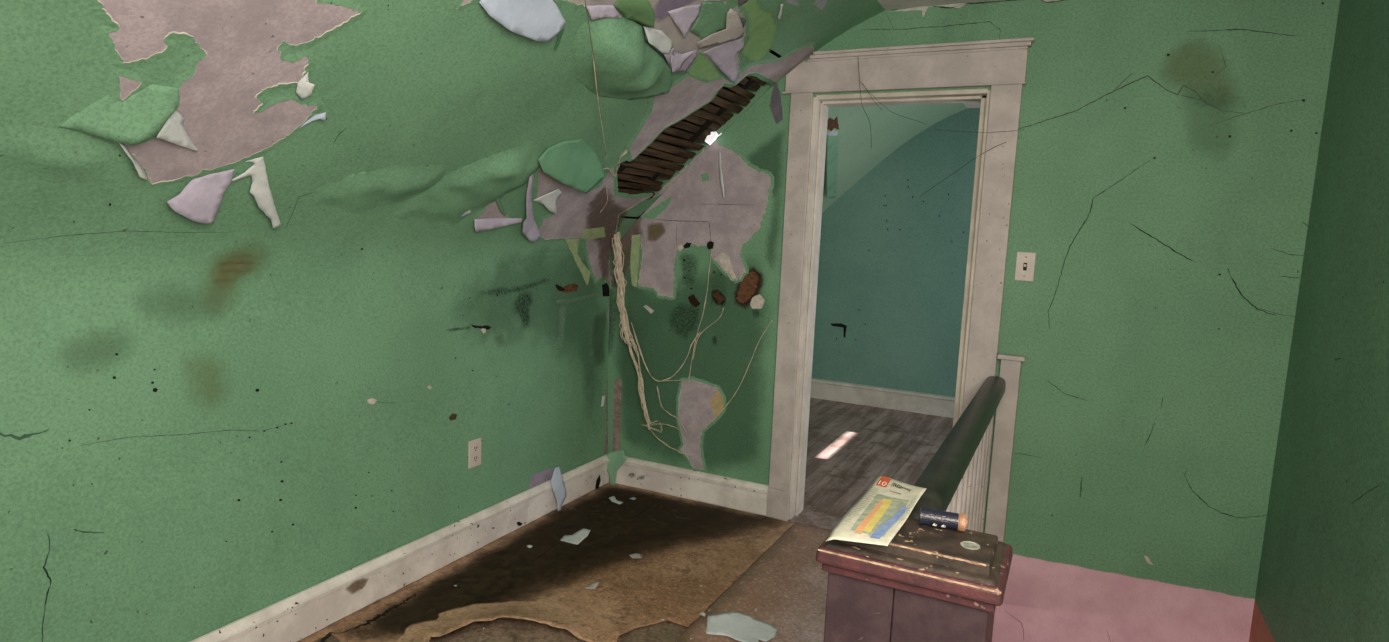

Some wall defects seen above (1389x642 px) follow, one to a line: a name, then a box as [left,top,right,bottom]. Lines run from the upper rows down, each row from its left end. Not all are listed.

peeling [778,0,827,20]
crack [866,14,1000,39]
flaking render [100,0,358,184]
crack [1020,29,1318,138]
flaking render [477,0,818,313]
crack [1048,157,1156,327]
crack [1130,223,1293,317]
flaking render [601,379,622,454]
flaking render [675,375,727,473]
crack [42,529,102,642]
water stain [377,473,775,639]